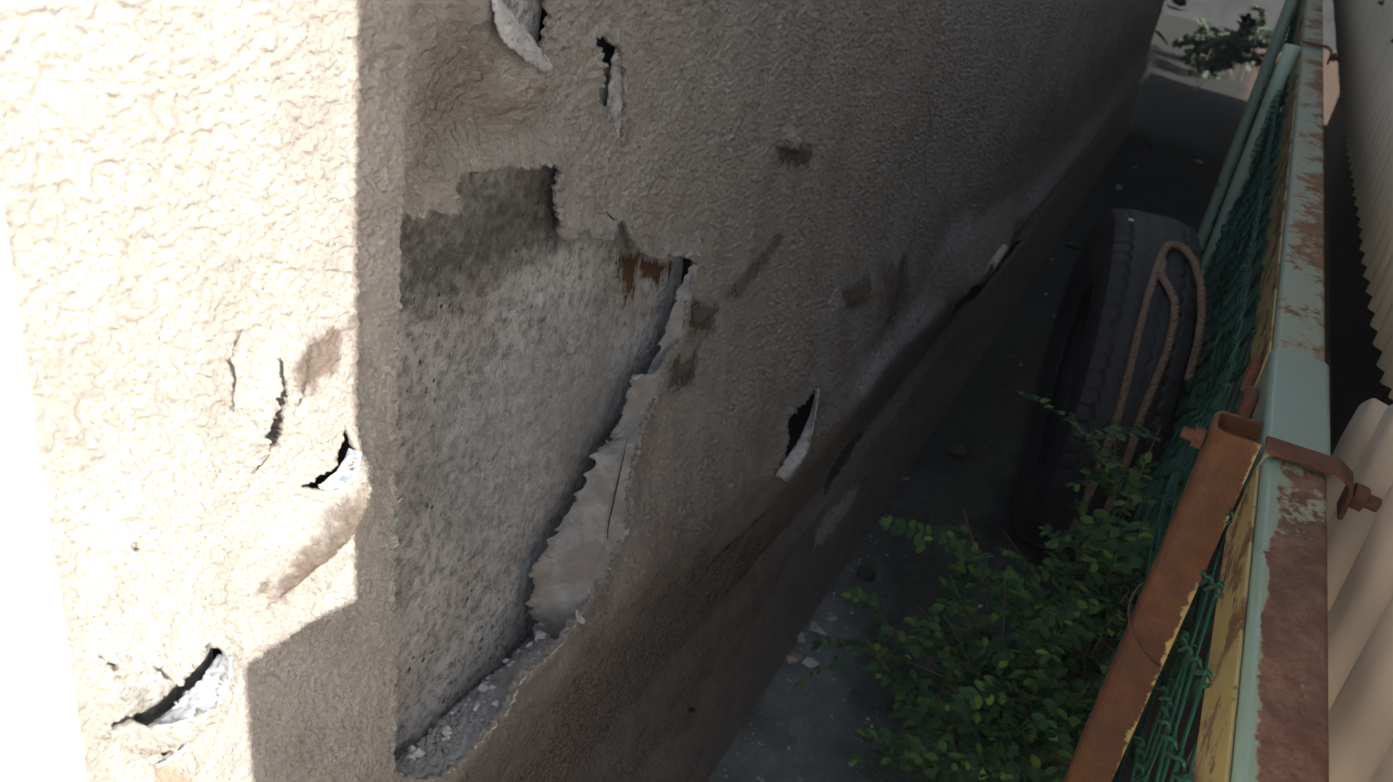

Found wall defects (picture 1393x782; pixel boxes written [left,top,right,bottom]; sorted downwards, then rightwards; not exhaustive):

peeling [491,0,553,72]
peeling [599,48,624,138]
rust [617,253,672,305]
crack [229,329,242,412]
crack [252,357,288,476]
peeling [317,448,362,494]
peeling [393,165,700,782]
peeling [775,389,820,482]
peeling [98,647,234,732]